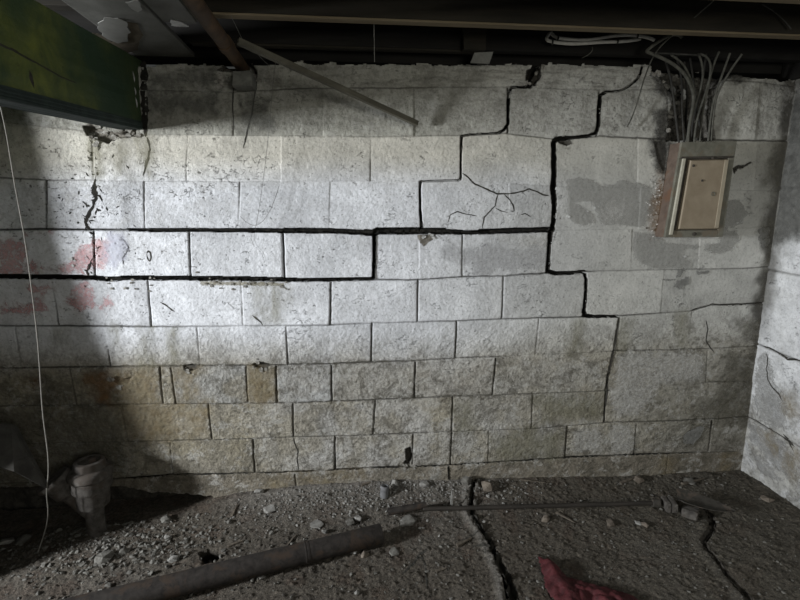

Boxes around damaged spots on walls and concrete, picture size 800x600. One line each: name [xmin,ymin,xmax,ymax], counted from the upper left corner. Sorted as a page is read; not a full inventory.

spalling [83,124,141,147]
crack [0,60,643,422]
crack [764,346,800,400]
crack [749,417,795,452]
crack [123,436,689,600]
crack [700,508,752,600]